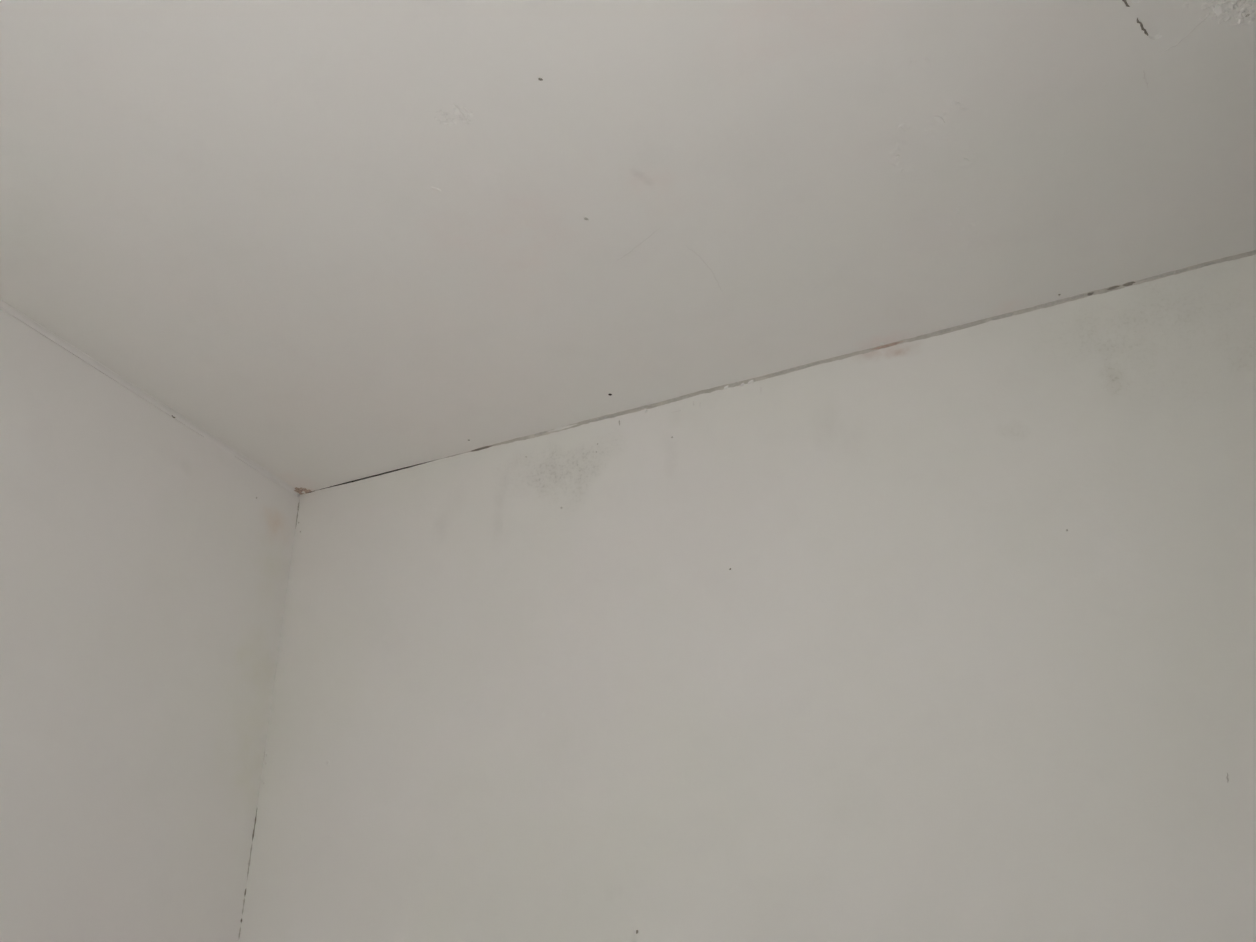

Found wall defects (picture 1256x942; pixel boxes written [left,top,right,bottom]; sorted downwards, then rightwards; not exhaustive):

crack [1121,0,1162,40]